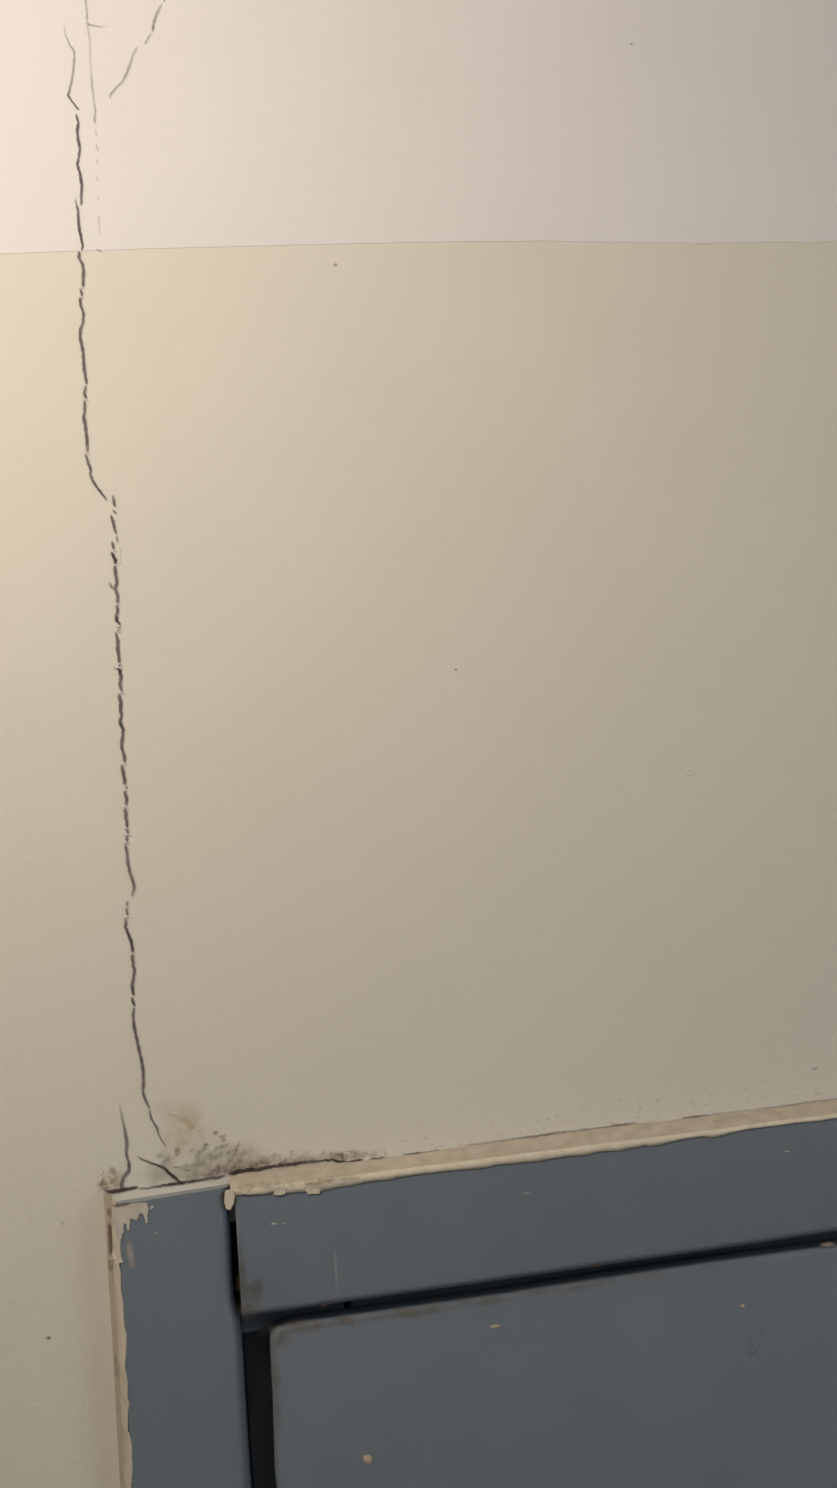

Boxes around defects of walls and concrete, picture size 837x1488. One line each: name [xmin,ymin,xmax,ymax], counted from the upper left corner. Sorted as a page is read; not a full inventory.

crack [67,85,183,1188]